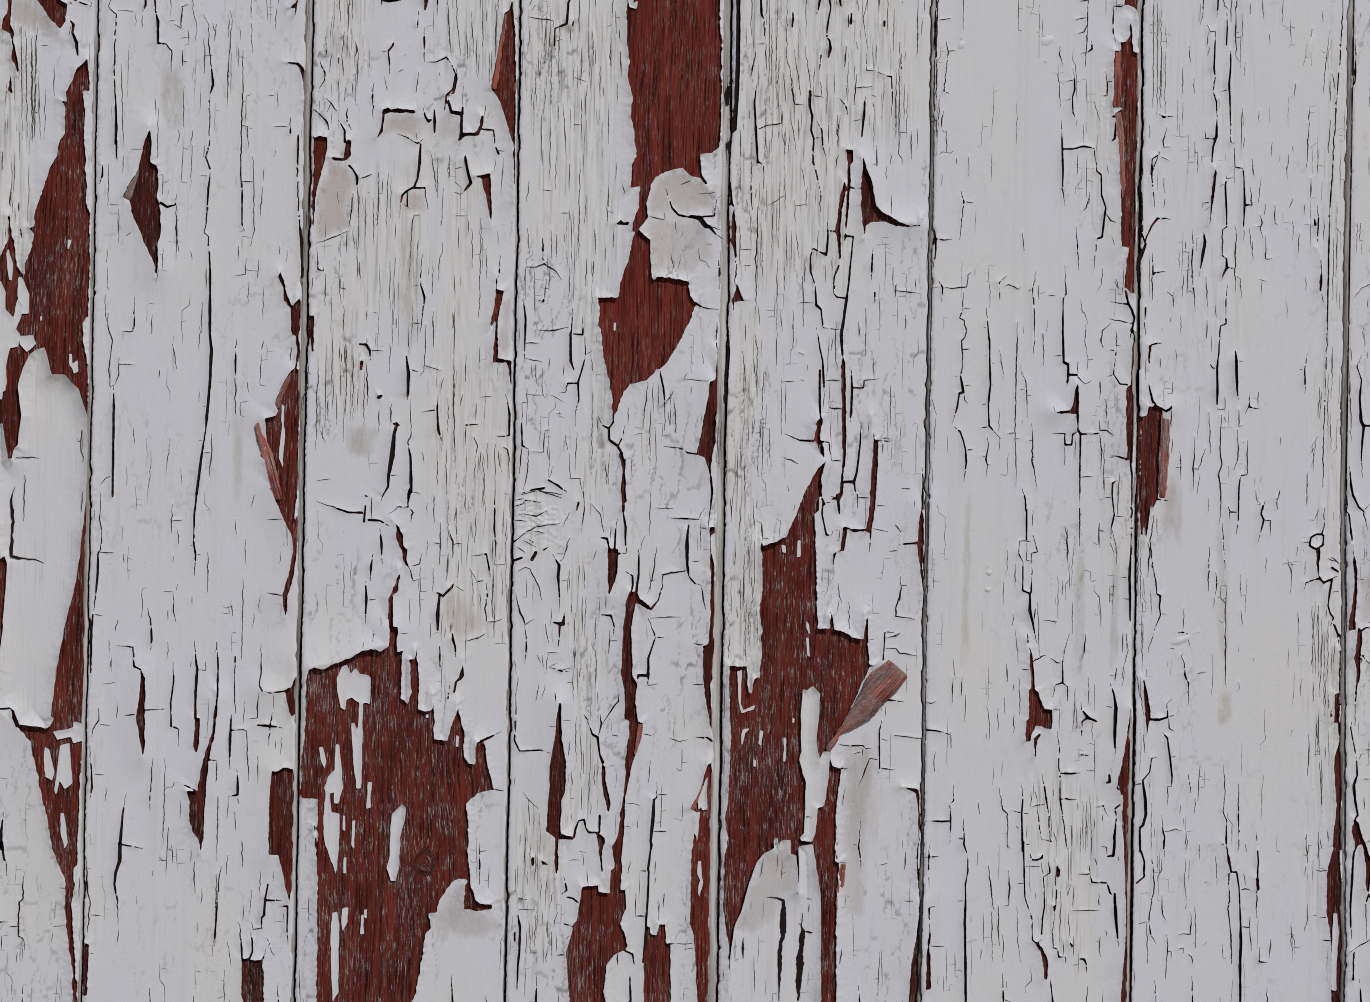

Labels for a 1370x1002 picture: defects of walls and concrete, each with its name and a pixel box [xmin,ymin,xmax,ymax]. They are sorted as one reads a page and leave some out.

crack [2,27,55,237]
peeling [123,130,163,273]
peeling [598,0,722,420]
peeling [1112,0,1138,296]
peeling [0,59,90,1002]
crack [52,706,143,942]
crack [69,0,311,1002]
peeling [268,525,494,1002]
peeling [566,863,671,1002]
peeling [690,351,907,1002]
crack [274,0,1370,1002]
peeling [1135,400,1170,537]